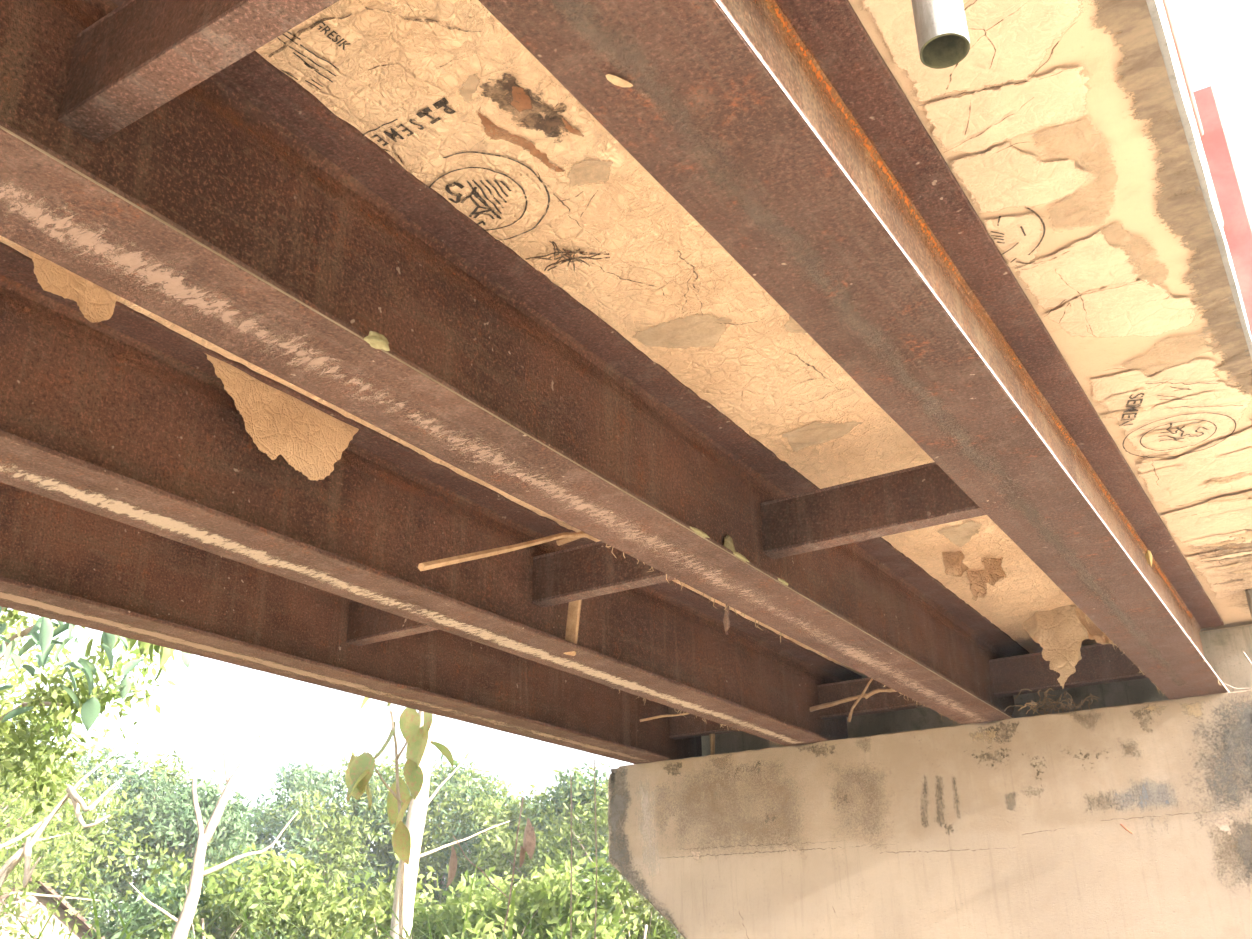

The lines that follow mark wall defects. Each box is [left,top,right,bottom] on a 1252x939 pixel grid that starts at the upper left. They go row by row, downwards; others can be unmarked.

spalling [459,73,584,143]
peeling [567,160,613,187]
damp [1094,0,1252,394]
rust [754,0,1193,619]
peeling [0,182,990,762]
damp [1194,531,1252,606]
damp [921,777,960,826]
damp [1086,782,1172,811]
damp [1195,700,1252,885]